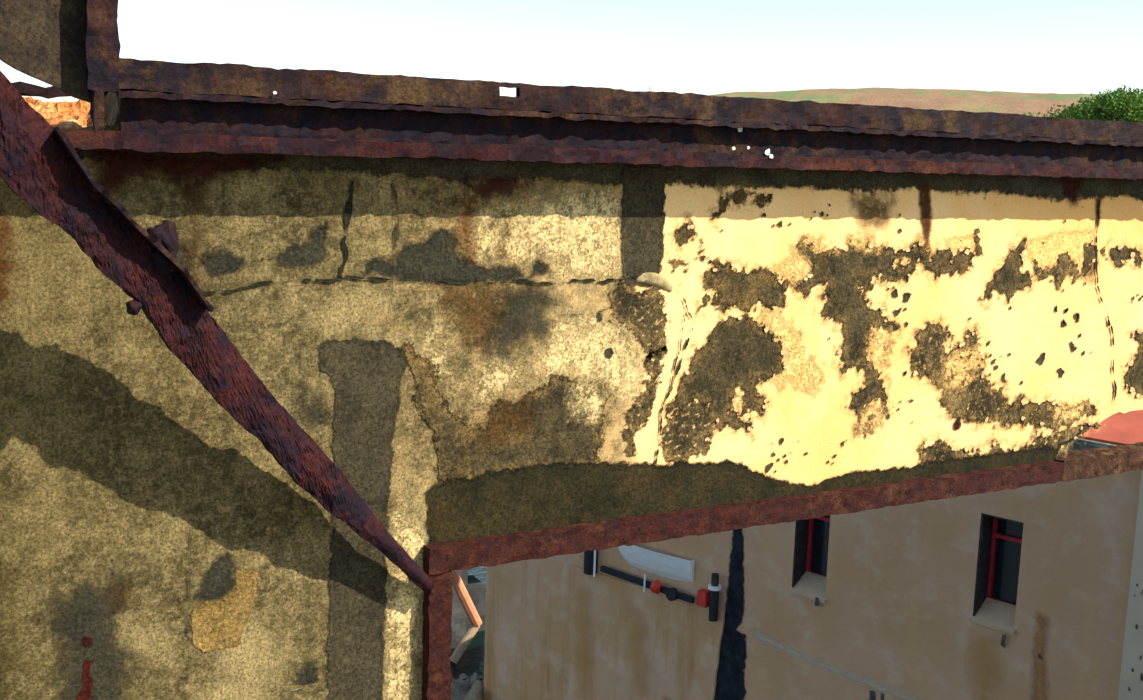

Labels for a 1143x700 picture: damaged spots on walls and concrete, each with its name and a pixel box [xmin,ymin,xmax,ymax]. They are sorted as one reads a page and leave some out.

rust [96,150,285,282]
crack [202,181,638,316]
damp [366,228,551,357]
crack [655,292,704,464]
rust [853,192,888,225]
rust [919,186,932,249]
crack [1057,201,1119,453]
rust [1033,616,1047,700]